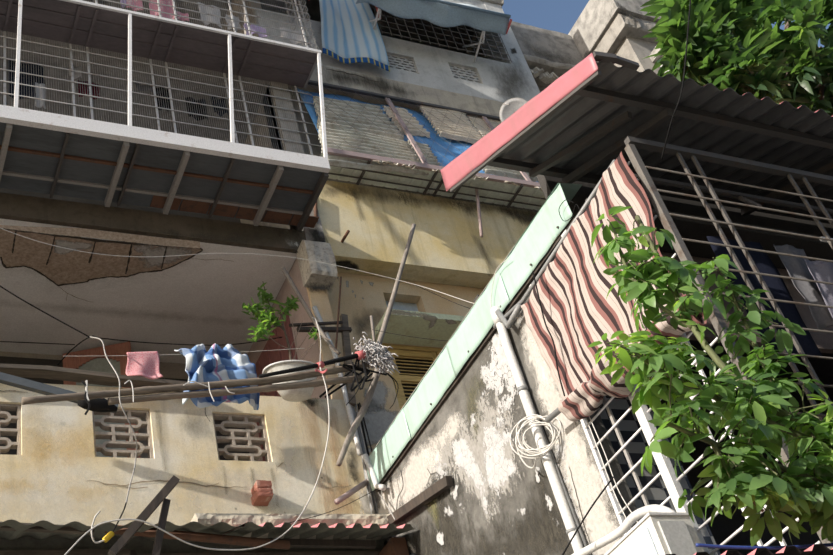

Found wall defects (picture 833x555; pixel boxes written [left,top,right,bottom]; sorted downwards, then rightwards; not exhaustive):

spalling [0,225,203,286]
peeling [432,334,518,516]
leakage [348,451,358,482]